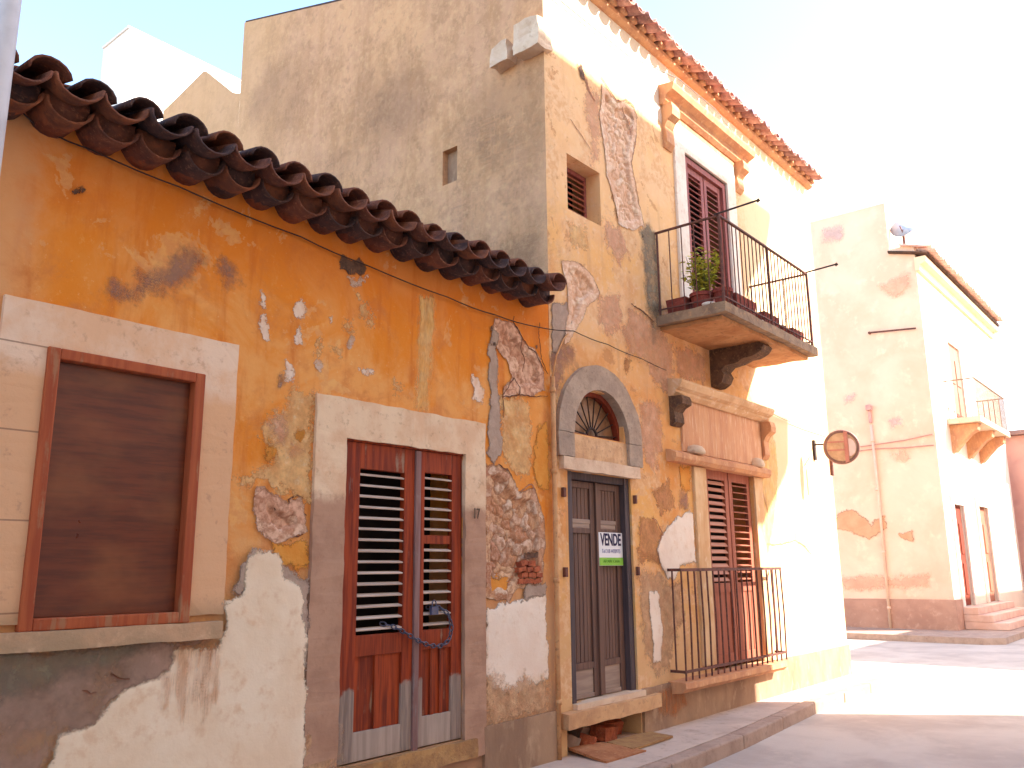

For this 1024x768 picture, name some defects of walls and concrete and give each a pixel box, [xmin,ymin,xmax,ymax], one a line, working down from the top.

spalling [586,84,644,264]
mould [110,250,201,298]
peeling [258,290,270,341]
peeling [293,299,355,373]
spalling [339,254,374,327]
flaking render [562,221,705,392]
flaking render [47,359,318,768]
spalling [486,318,551,725]
flaking render [636,466,696,677]
flaking render [836,509,887,540]